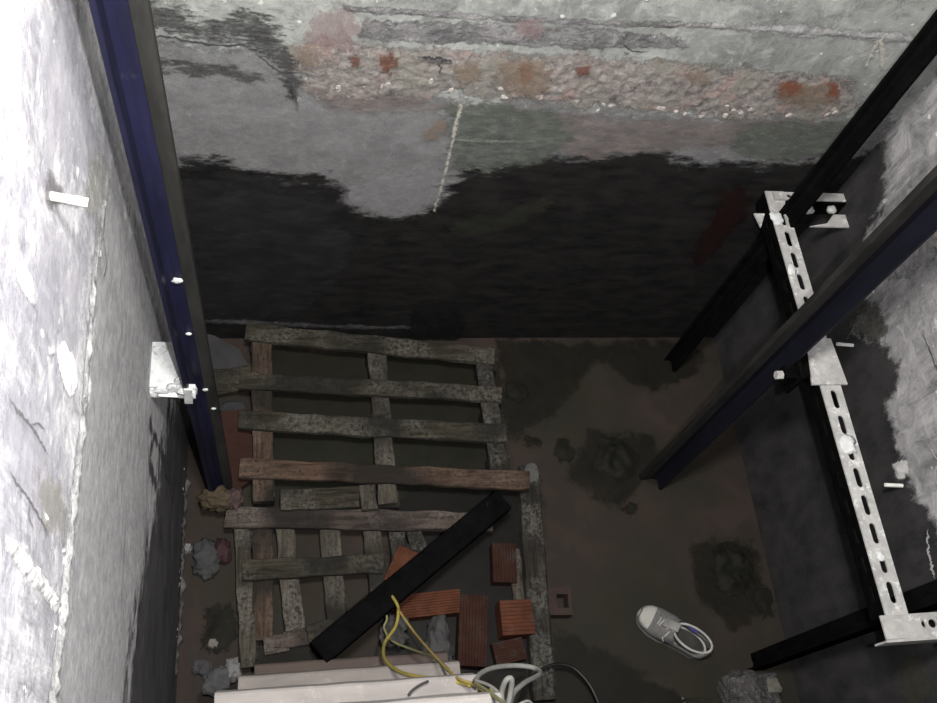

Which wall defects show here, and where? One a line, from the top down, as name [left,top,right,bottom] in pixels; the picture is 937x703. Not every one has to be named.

spalling [283,31,861,124]
damp [156,26,865,339]
crack [9,396,47,452]
crack [11,472,50,538]